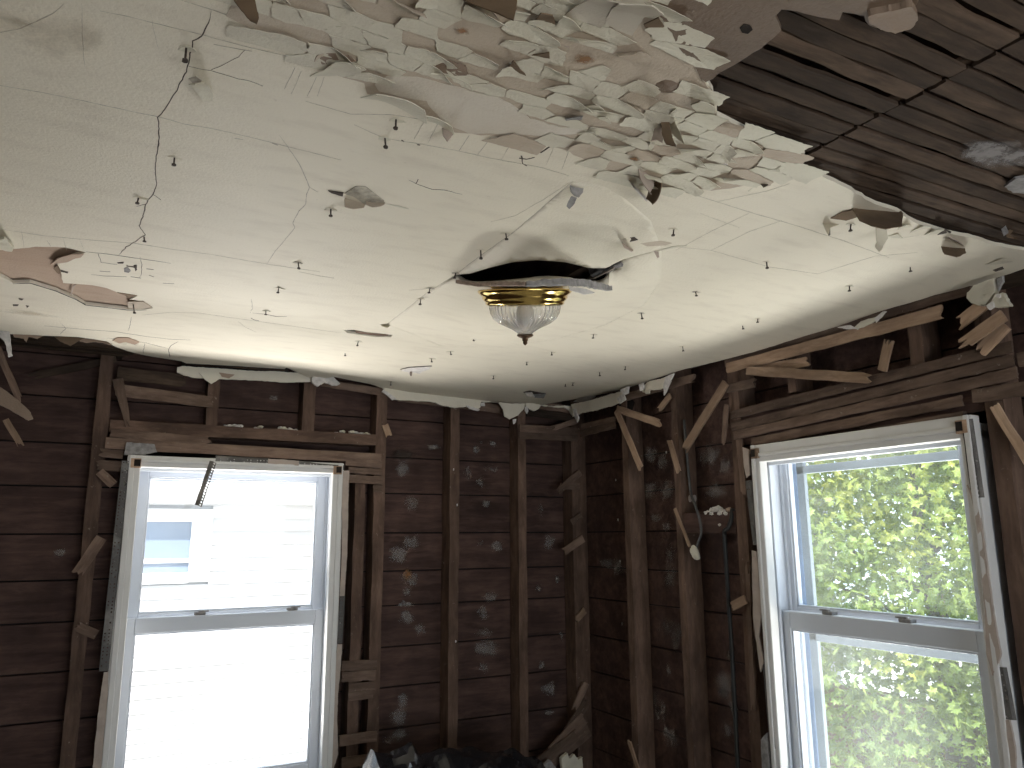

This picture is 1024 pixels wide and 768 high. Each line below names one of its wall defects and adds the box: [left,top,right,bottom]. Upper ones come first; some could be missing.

peeling [215,0,919,205]
crack [0,0,573,322]
peeling [328,186,408,209]
peeling [822,208,966,257]
peeling [0,247,152,310]